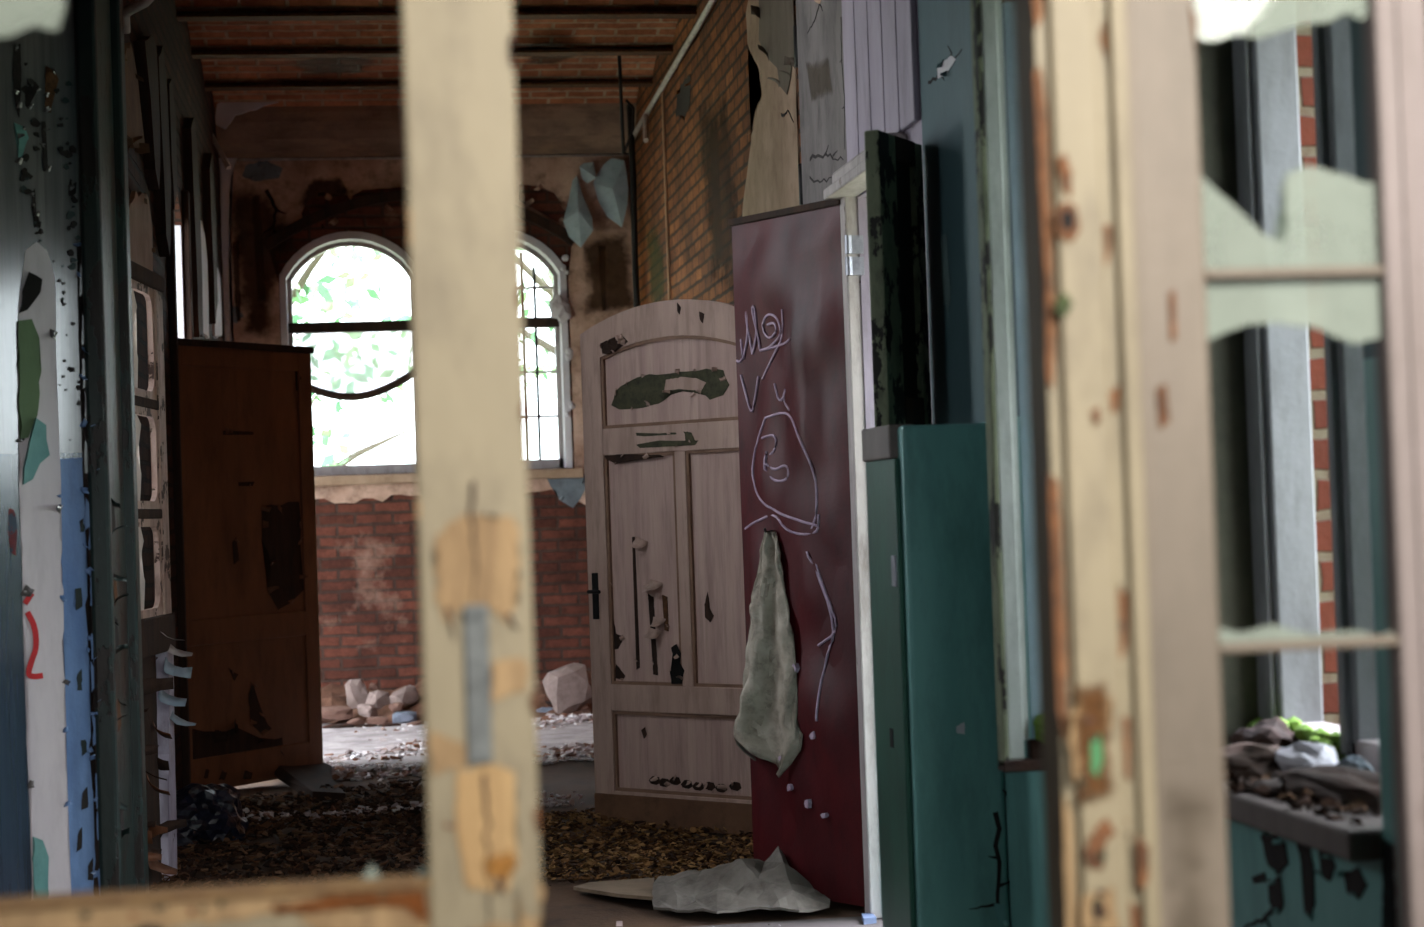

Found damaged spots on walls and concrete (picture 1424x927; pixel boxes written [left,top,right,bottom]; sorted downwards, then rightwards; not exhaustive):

peeling [751,0,795,94]
peeling [519,158,628,275]
peeling [549,294,573,324]
peeling [8,43,130,895]
peeling [491,657,537,717]
crack [969,812,1010,910]
peeling [1252,831,1368,921]